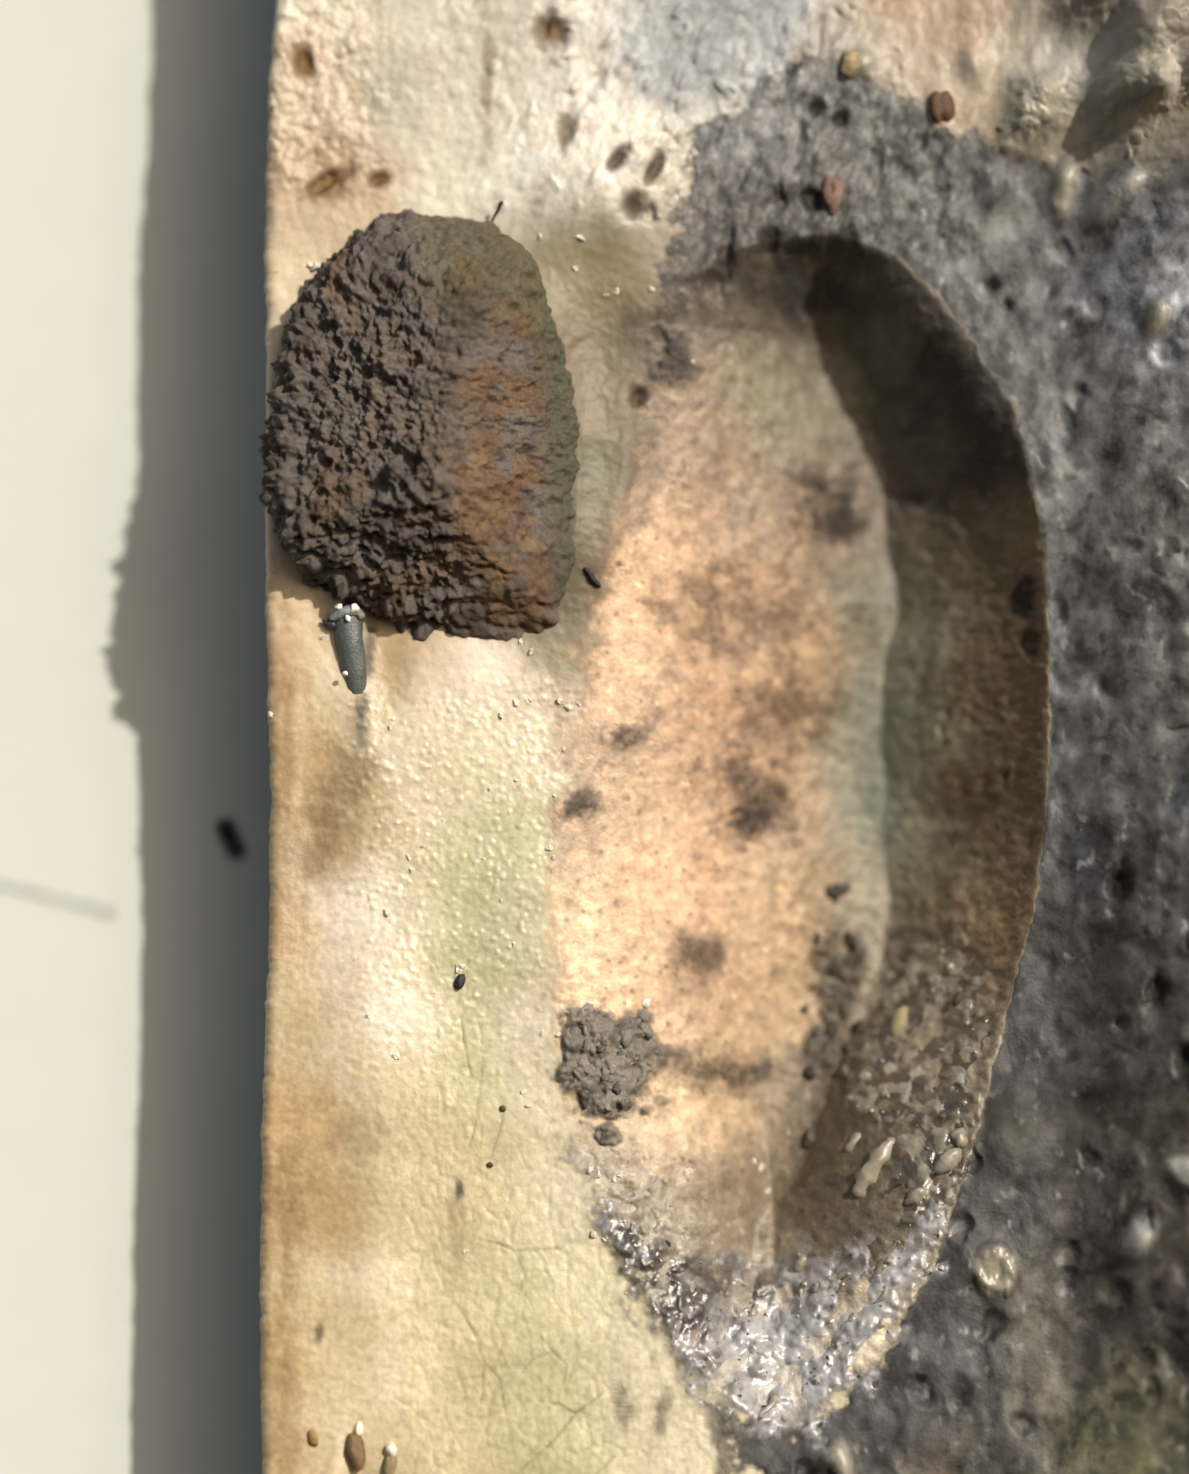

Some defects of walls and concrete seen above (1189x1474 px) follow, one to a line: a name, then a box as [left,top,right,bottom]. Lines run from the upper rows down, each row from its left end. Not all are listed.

water stain [637,332,695,404]
water stain [804,478,865,541]
water stain [1012,577,1038,655]
water stain [730,765,786,835]
spalling [548,55,1189,1474]
water stain [595,930,993,1474]